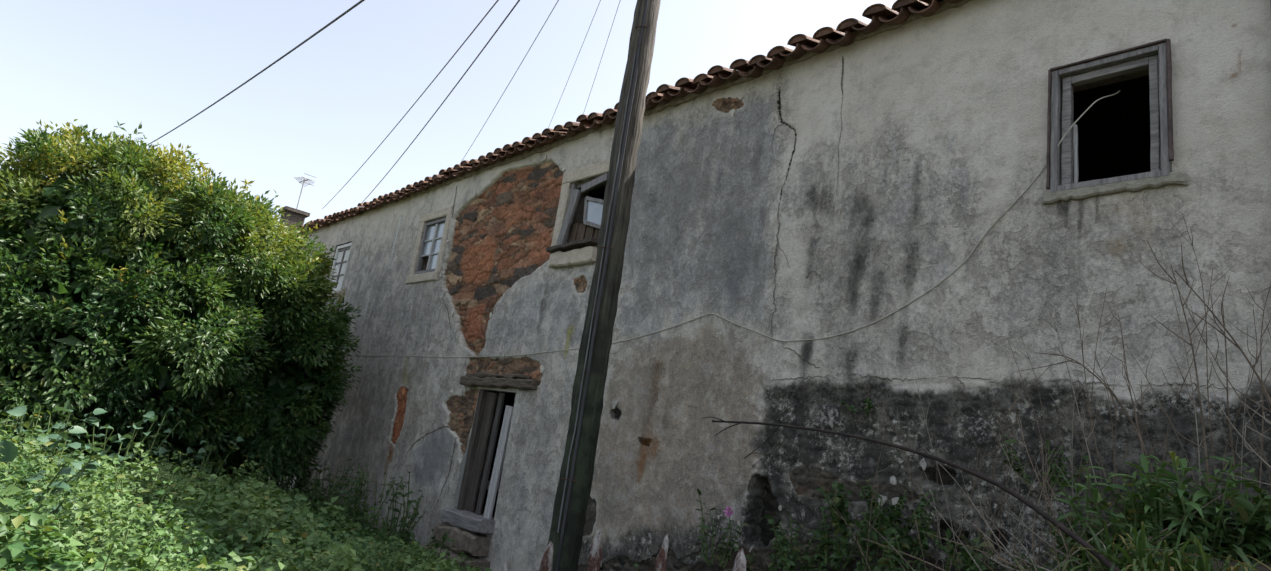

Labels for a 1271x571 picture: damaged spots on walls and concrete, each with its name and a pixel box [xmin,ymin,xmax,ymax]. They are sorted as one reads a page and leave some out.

flaking render [712,96,744,117]
crack [770,90,1271,416]
flaking render [574,276,591,293]
flaking render [440,154,565,464]
hole [919,458,957,485]